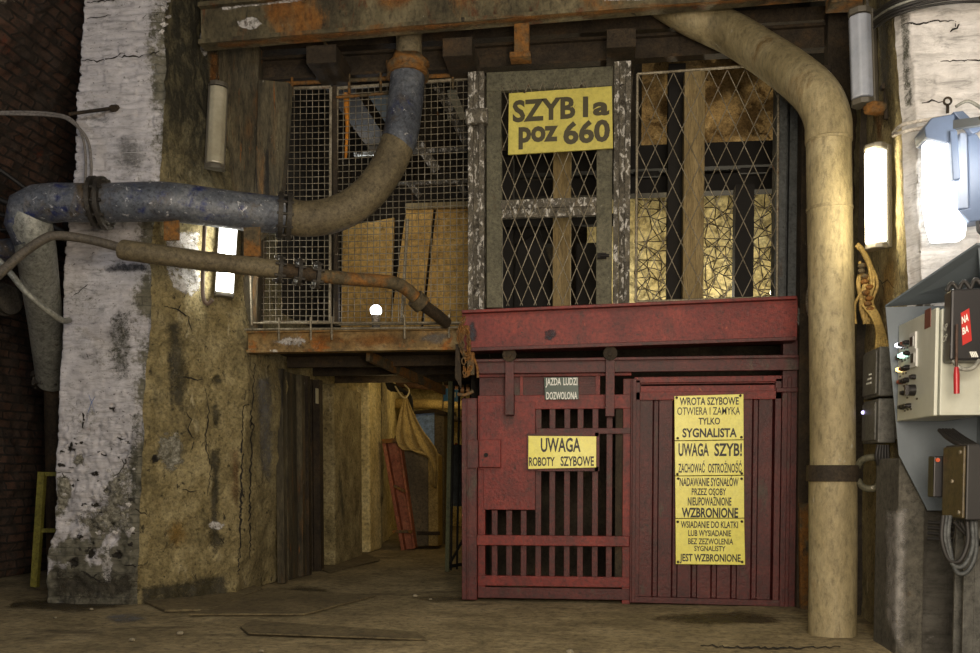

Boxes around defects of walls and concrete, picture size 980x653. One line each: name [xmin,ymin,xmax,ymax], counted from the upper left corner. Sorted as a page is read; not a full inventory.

crack [82,51,159,63]
leakage [108,311,131,380]
spalling [57,438,135,568]
crack [238,363,256,575]